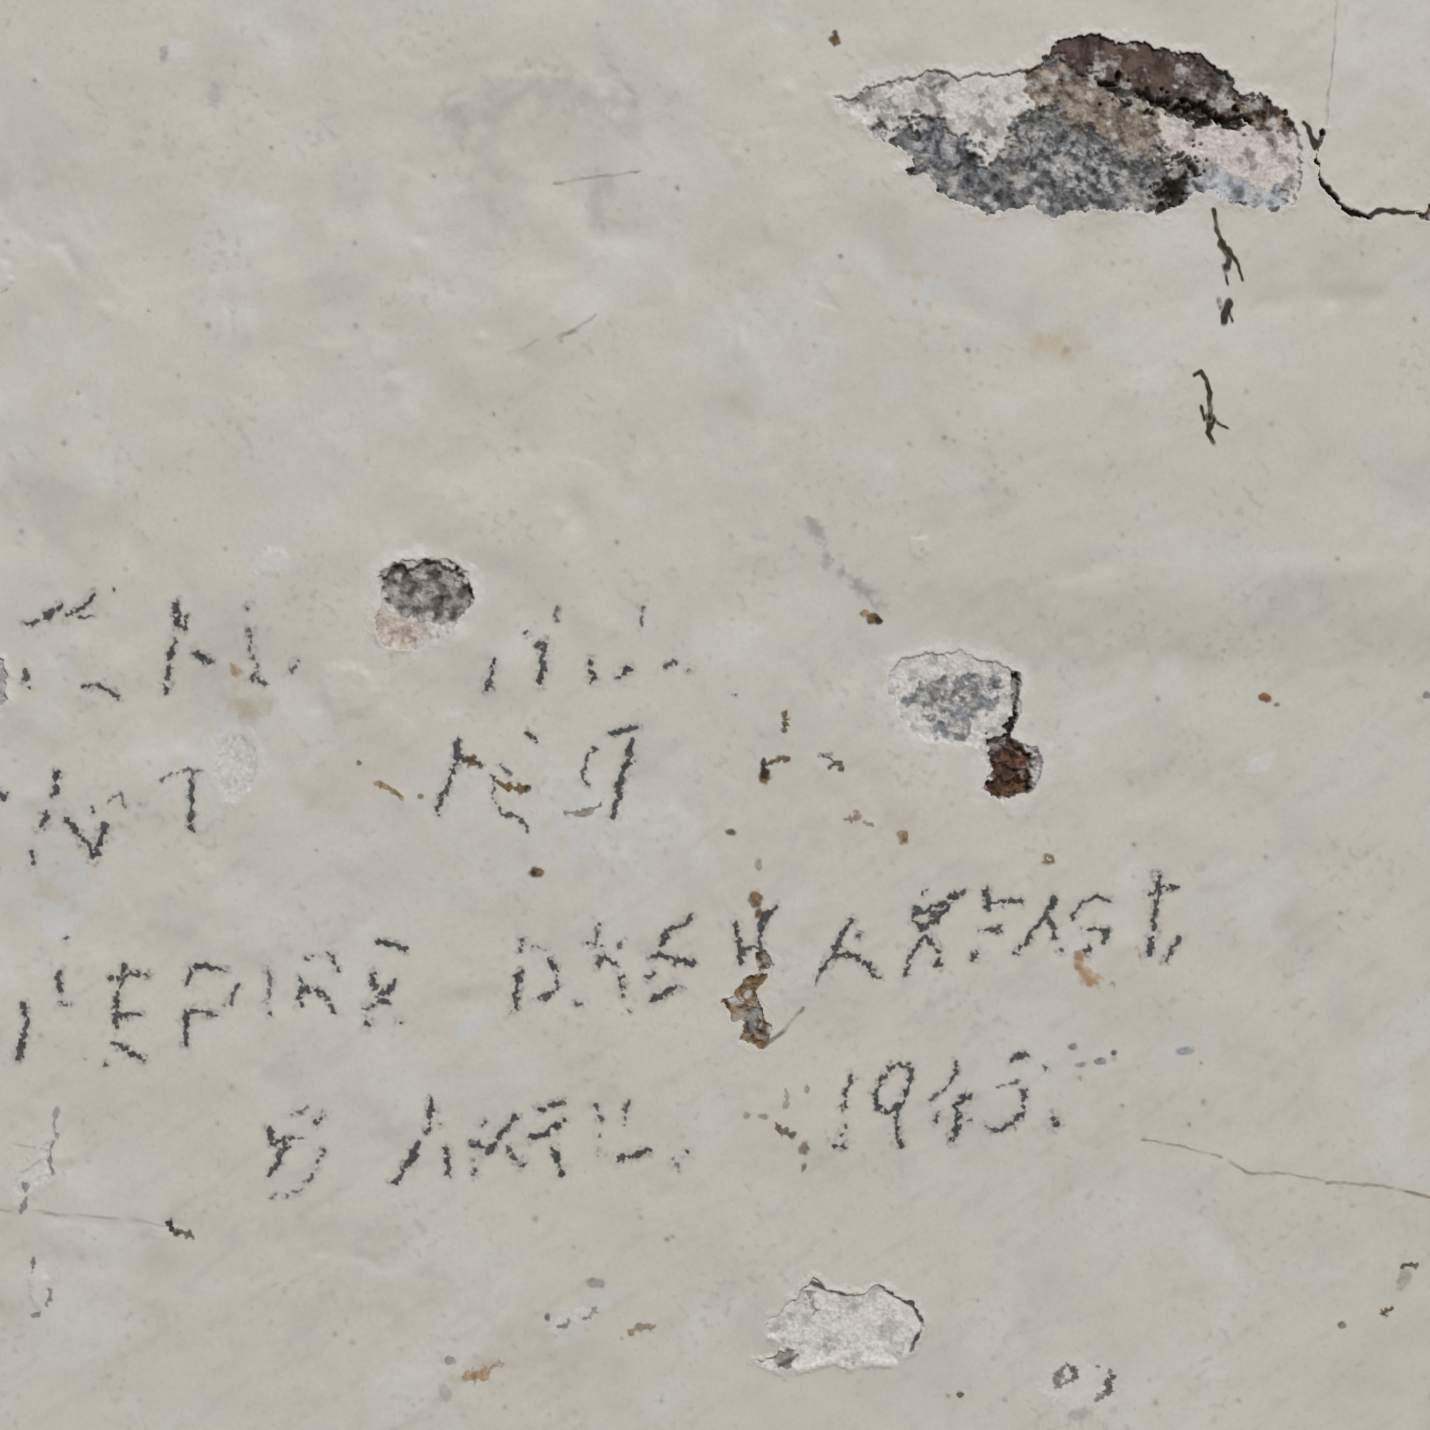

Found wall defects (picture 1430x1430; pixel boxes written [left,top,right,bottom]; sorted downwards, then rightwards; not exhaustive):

spalling [816,13,1320,234]
crack [1302,120,1422,230]
spalling [1407,187,1430,230]
spalling [352,537,493,672]
peeling [860,610,883,624]
spalling [0,643,24,727]
spalling [866,628,1063,821]
crack [1178,1145,1255,1174]
crack [1374,1185,1430,1198]
spalling [746,1268,932,1380]